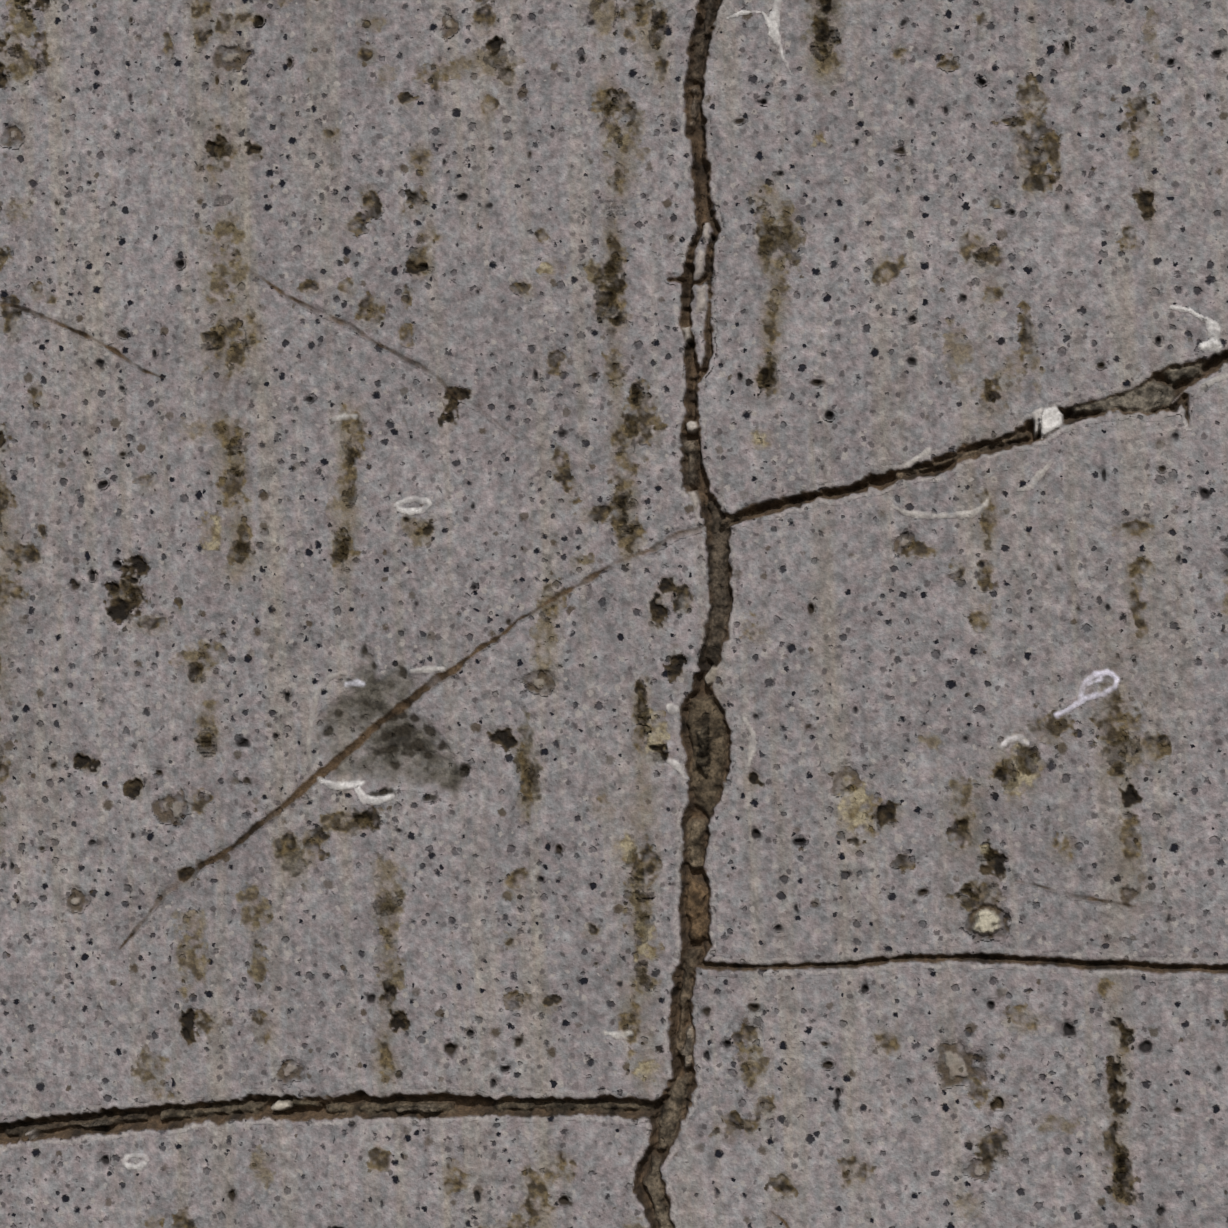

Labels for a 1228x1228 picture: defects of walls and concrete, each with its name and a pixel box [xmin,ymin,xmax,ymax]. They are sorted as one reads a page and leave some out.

crack [0,300,168,380]
crack [247,268,520,440]
crack [624,0,1228,1228]
crack [118,525,704,951]
crack [0,1083,665,1153]